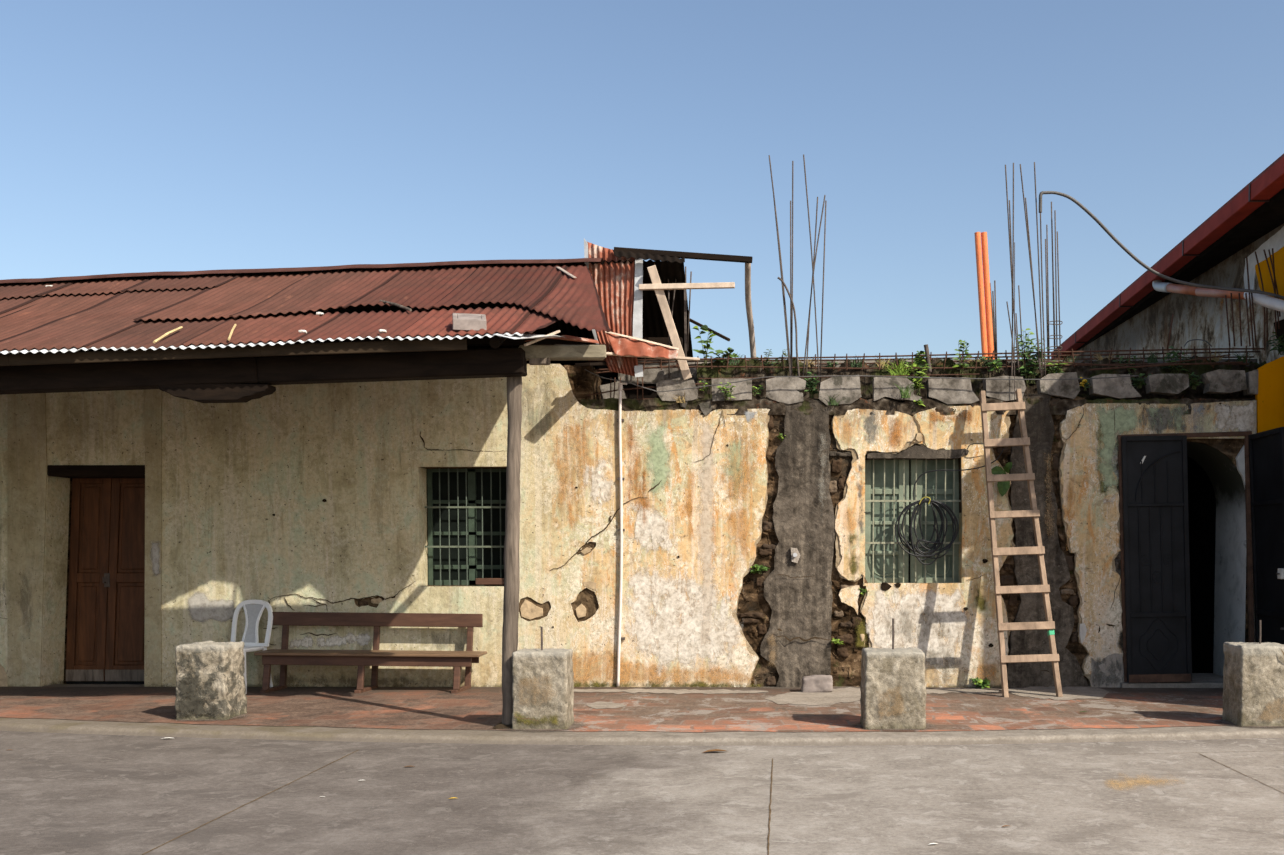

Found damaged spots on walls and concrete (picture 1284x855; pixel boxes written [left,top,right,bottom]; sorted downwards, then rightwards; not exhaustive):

corrosion [584,239,685,377]
flaking render [1225,226,1284,351]
damp [561,425,612,521]
flaking render [1050,396,1085,496]
crack [263,581,415,645]
flaking render [519,596,551,621]
flaking render [571,588,599,622]
crack [550,480,662,571]
damp [625,424,739,674]
flaking render [737,415,784,687]
flaking render [831,569,869,680]
flaking render [999,522,1021,623]